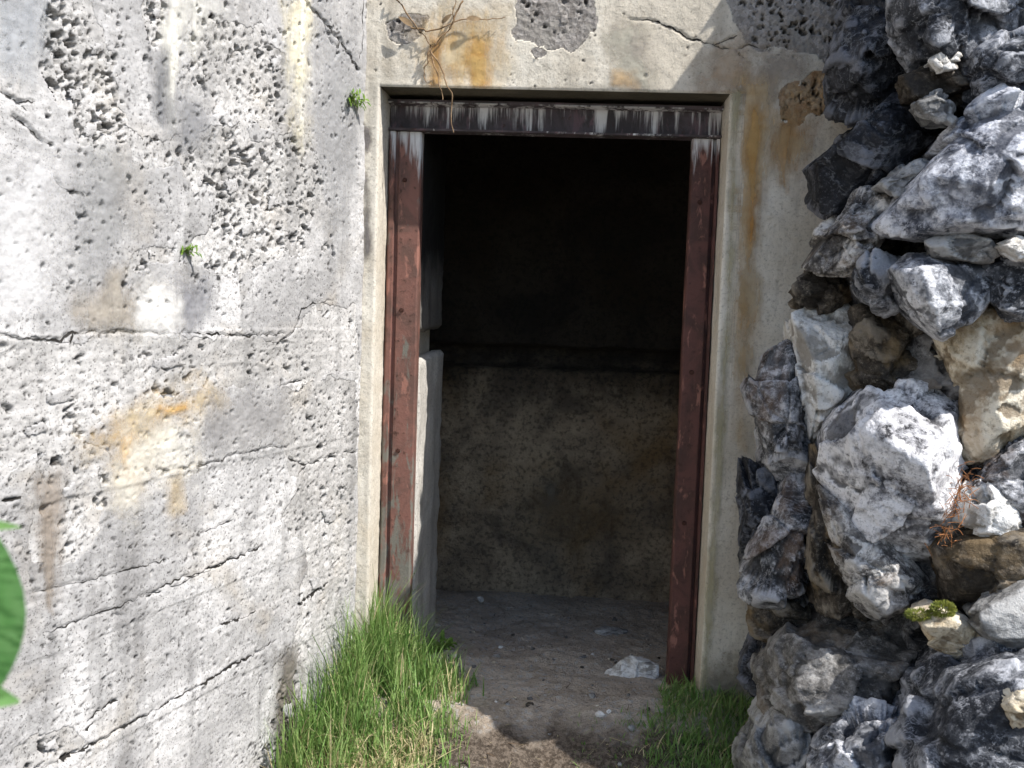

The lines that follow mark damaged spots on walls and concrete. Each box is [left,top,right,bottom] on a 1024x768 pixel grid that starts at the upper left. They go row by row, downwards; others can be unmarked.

crack [309,1,364,71]
spalling [385,14,429,45]
corrosion [428,21,489,86]
spalling [511,0,598,59]
crack [631,19,758,58]
spalling [726,0,840,126]
corrosion [733,78,774,328]
crack [1,299,331,344]
crack [161,446,356,476]
crack [35,546,261,632]
crack [297,582,328,605]
crack [48,640,275,765]